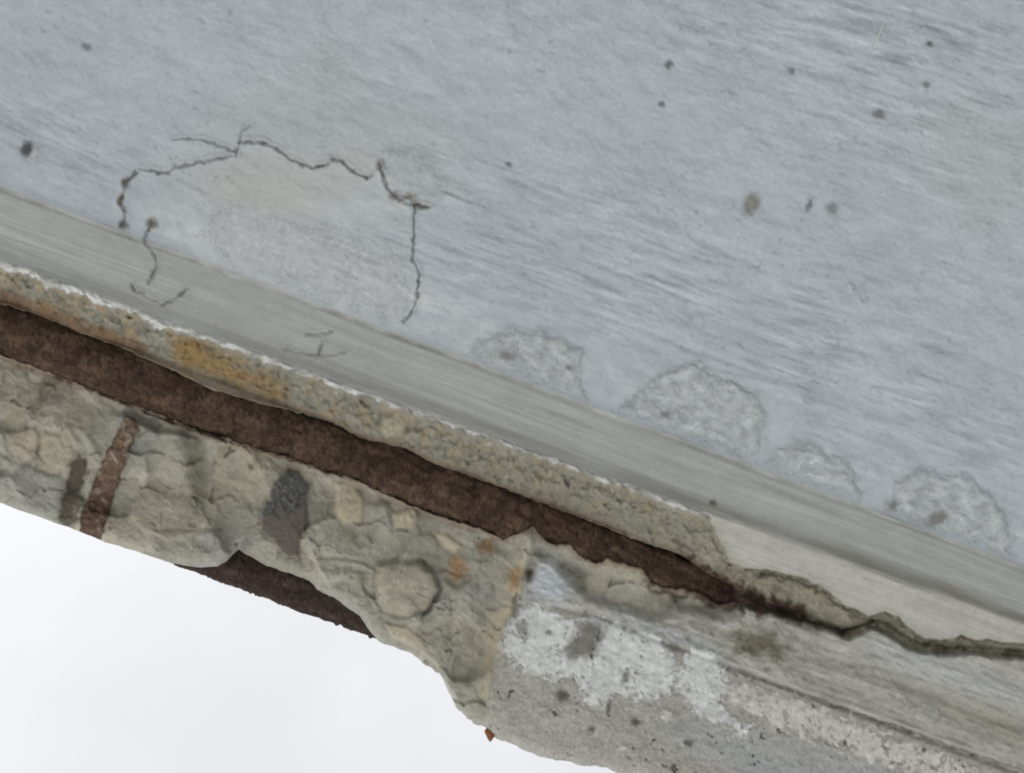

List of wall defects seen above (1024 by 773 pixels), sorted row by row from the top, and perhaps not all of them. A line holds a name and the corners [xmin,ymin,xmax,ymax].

spalling [0,267,1024,725]
rust [652,556,806,625]
crack [734,570,890,634]